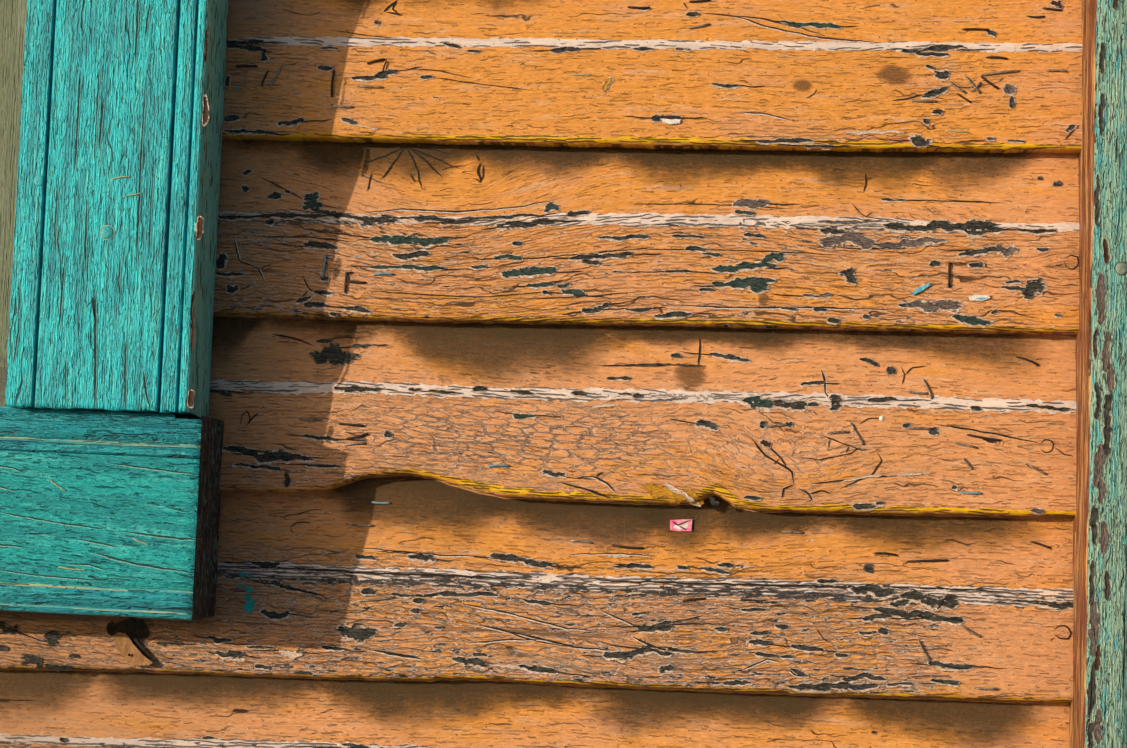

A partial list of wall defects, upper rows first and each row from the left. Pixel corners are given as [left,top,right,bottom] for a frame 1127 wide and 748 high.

damp [878,66,910,83]
peeling [890,43,980,101]
peeling [739,129,940,150]
peeling [218,191,590,273]
peeling [798,218,1057,269]
peeling [485,233,712,320]
peeling [694,252,832,313]
peeling [740,380,845,413]
peeling [815,563,965,626]
peeling [156,625,378,662]
peeling [580,616,715,676]
peeling [786,668,888,694]